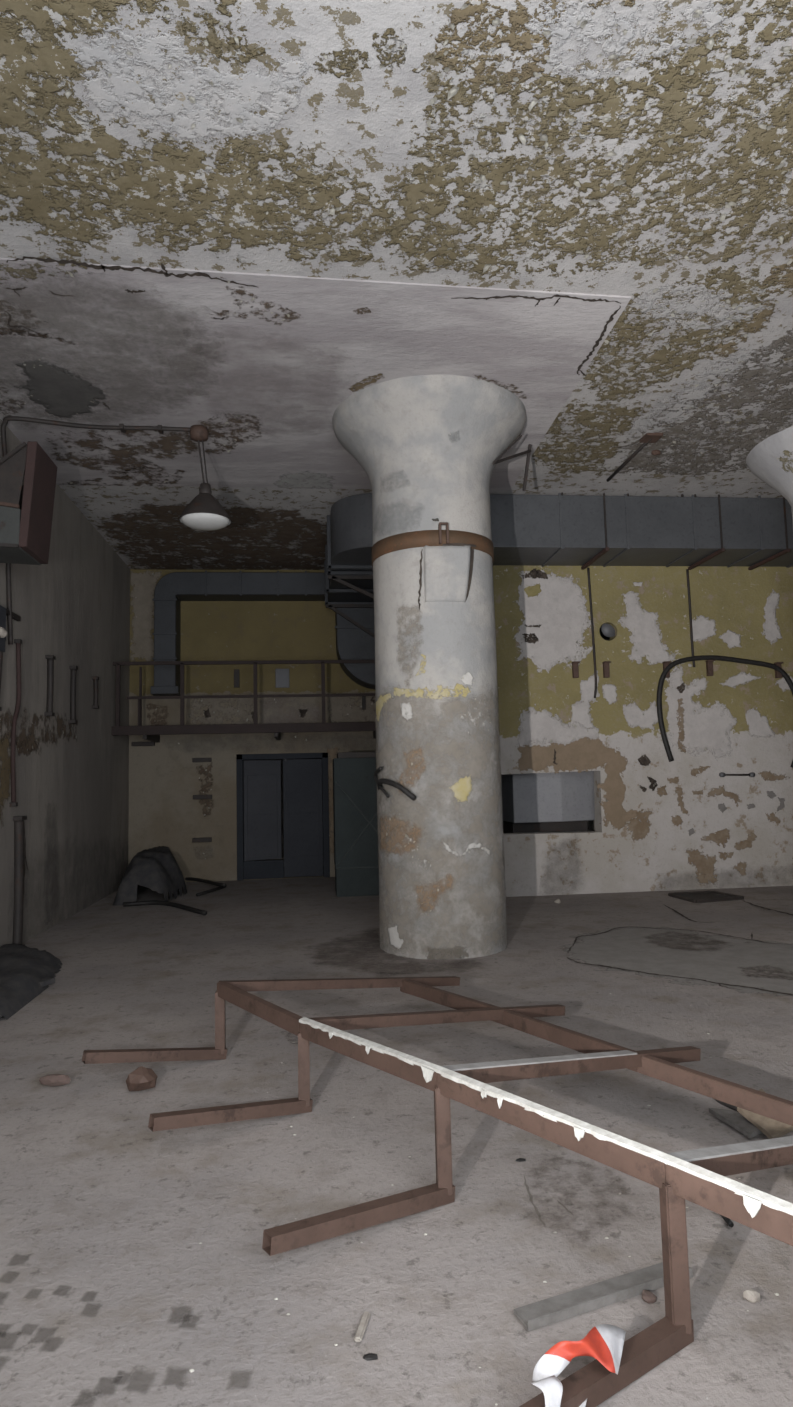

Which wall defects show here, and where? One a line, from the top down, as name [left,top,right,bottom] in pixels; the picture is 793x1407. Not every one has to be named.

peeling [0,0,793,477]
crack [1,256,259,333]
crack [451,295,621,376]
water stain [0,290,199,486]
water stain [97,504,327,570]
peeling [328,654,491,734]
peeling [513,568,793,884]
flaking render [327,746,338,854]
peeling [449,775,472,802]
peeling [443,842,490,856]
peeling [388,926,403,949]
crack [567,900,793,995]